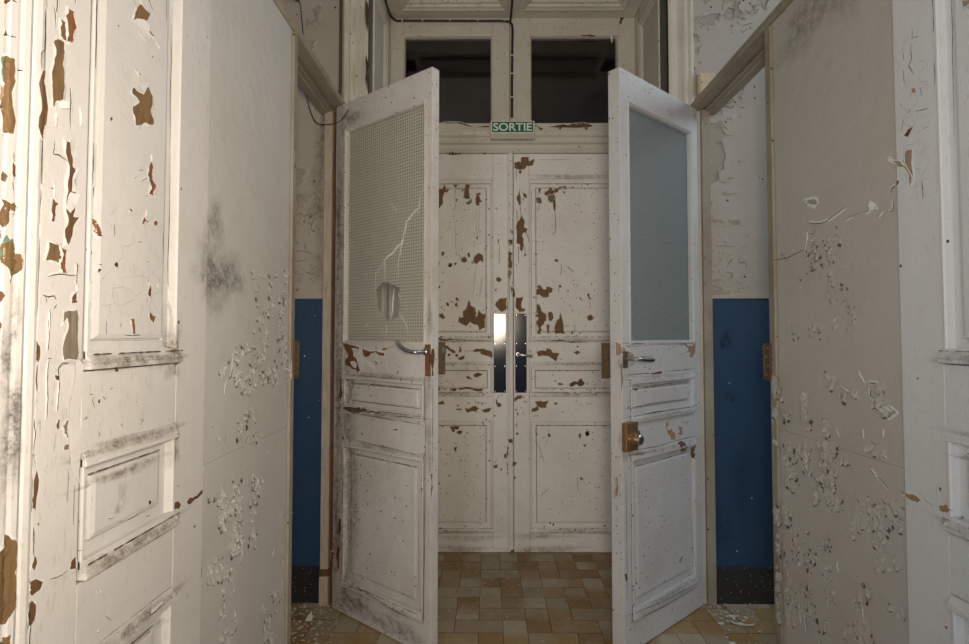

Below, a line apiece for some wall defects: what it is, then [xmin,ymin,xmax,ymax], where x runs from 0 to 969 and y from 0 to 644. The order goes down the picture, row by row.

peeling [0,53,23,137]
peeling [130,68,155,129]
peeling [131,0,161,49]
peeling [0,159,26,304]
peeling [36,0,115,483]
peeling [431,157,591,417]
peeling [31,420,41,512]
peeling [0,526,81,644]
peeling [174,469,264,644]
peeling [339,343,468,504]
peeling [493,378,593,479]
peeling [771,370,964,635]